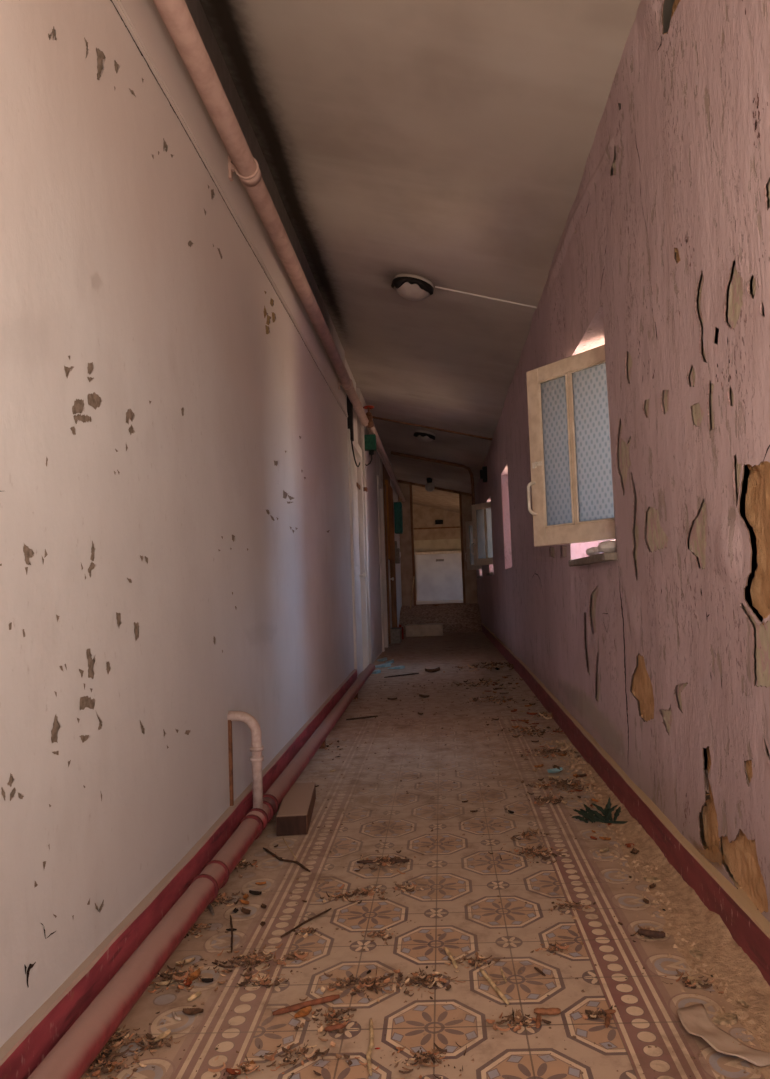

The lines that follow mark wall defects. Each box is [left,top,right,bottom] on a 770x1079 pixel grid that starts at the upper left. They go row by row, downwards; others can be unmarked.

spalling [70,362,102,435]
spalling [23,544,48,574]
flaking render [733,457,770,687]
spalling [59,648,111,743]
flaking render [632,654,688,733]
spalling [51,715,71,767]
flaking render [703,746,768,913]